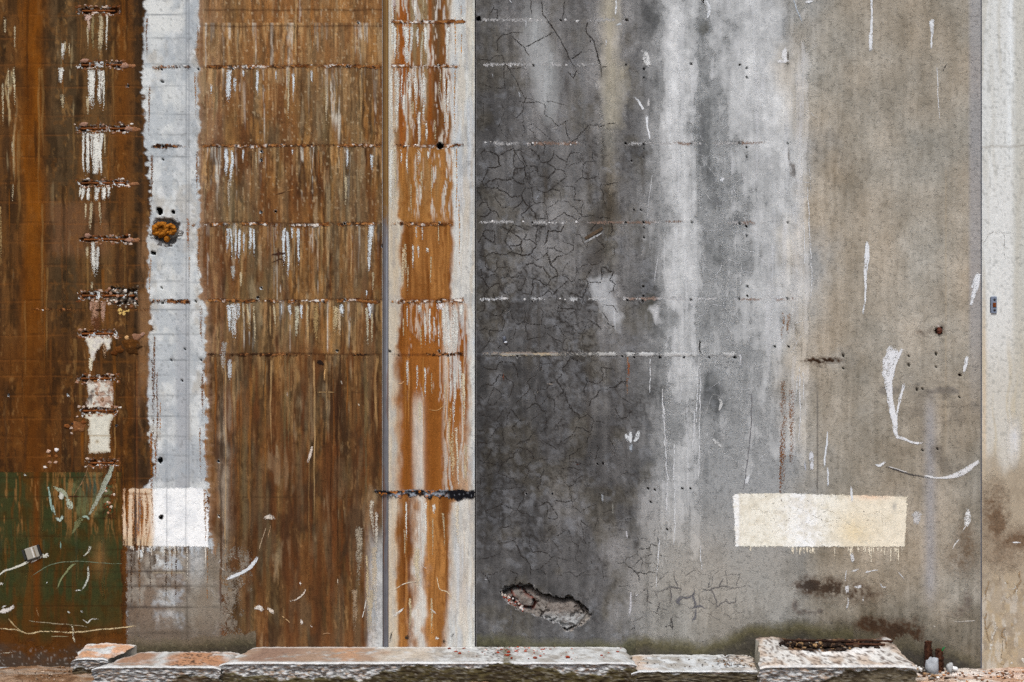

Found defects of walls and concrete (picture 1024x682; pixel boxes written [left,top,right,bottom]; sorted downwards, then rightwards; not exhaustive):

efflorescence [82,132,106,175]
efflorescence [86,69,105,114]
efflorescence [84,15,108,55]
efflorescence [79,186,110,288]
rust [0,0,171,667]
efflorescence [81,301,114,454]
rust [186,0,474,647]
crack [34,1,749,630]
water stain [401,0,813,647]
spalling [501,581,599,632]